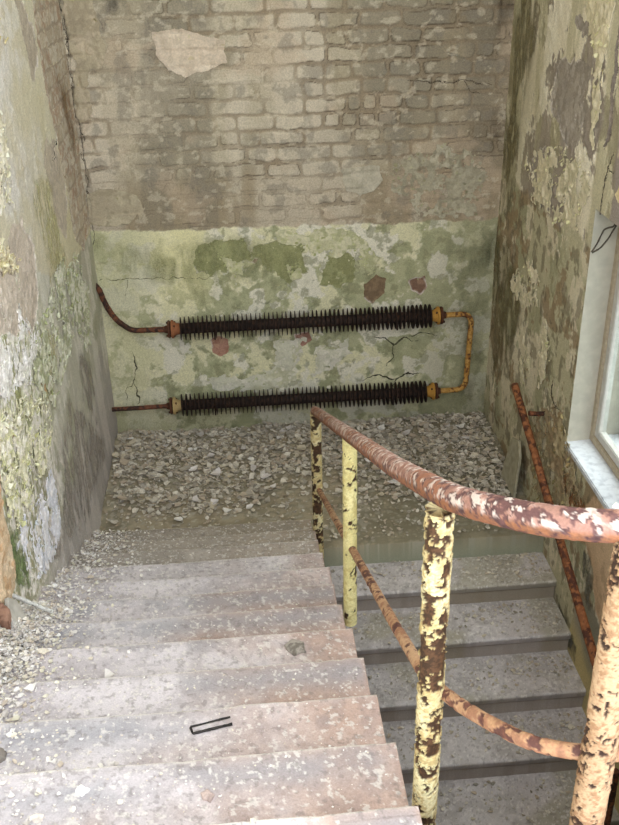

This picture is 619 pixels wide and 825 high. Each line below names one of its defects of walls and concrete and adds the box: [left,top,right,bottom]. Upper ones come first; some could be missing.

peeling [151,28,227,78]
crack [58,0,89,194]
peeling [524,0,616,232]
flaking render [0,0,143,604]
spalling [408,276,427,295]
peeling [510,259,541,312]
crack [125,354,141,411]
crack [363,332,437,386]
peeling [519,319,551,389]